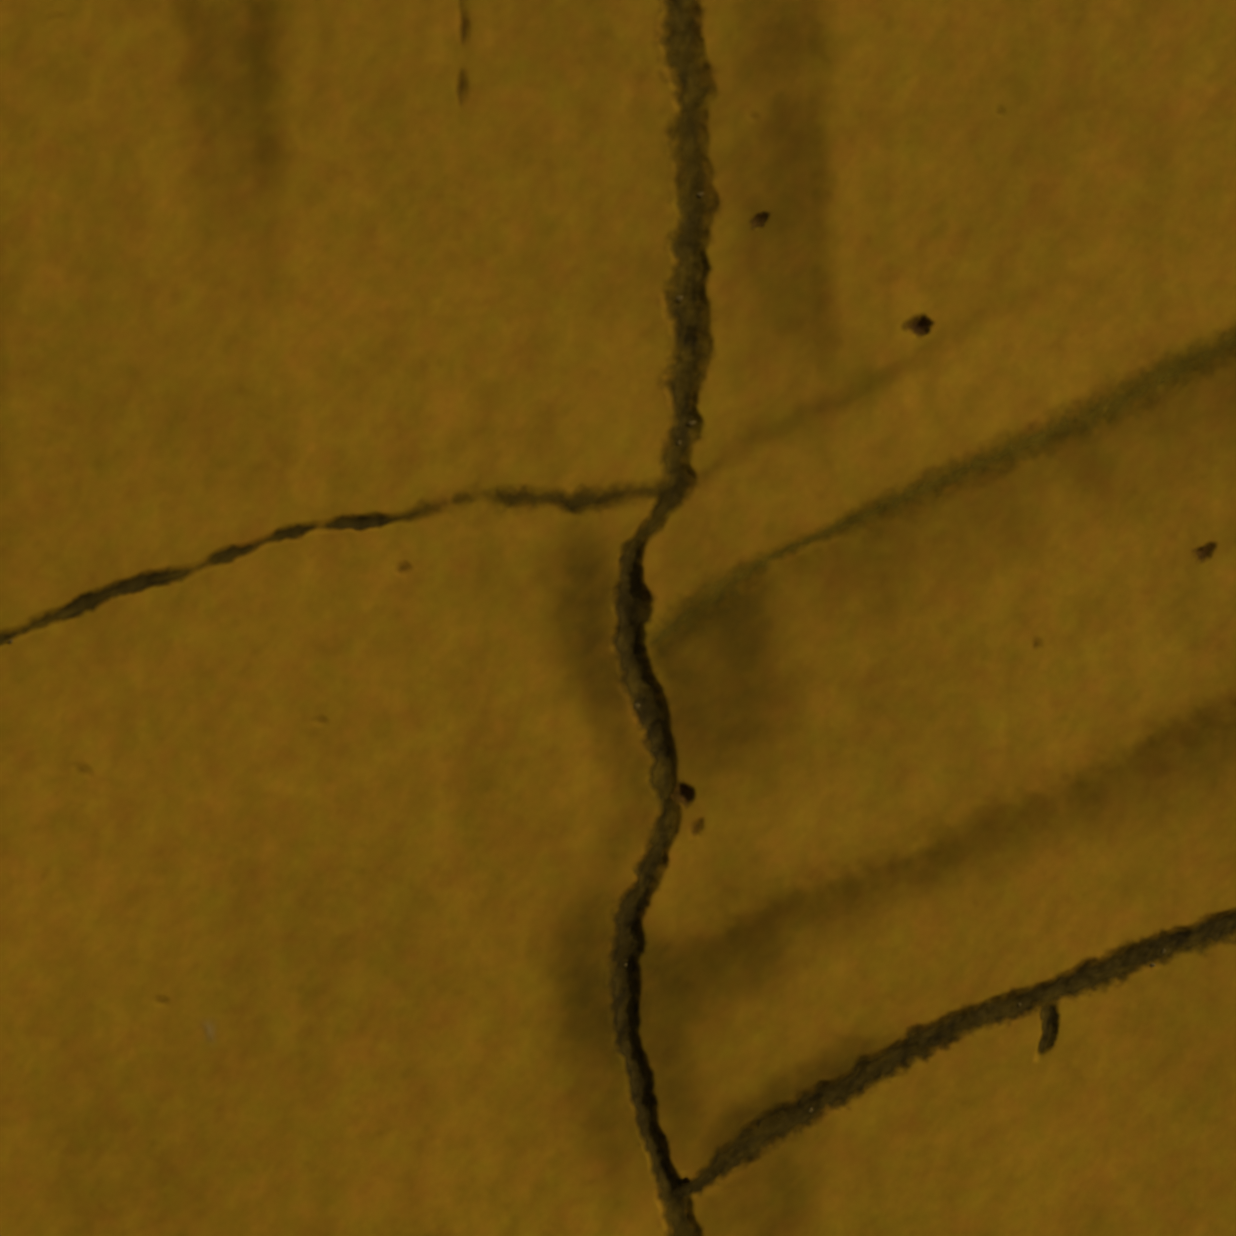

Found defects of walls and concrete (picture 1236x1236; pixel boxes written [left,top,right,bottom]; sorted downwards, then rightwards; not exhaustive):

crack [0,498,458,645]
crack [496,0,1236,1236]